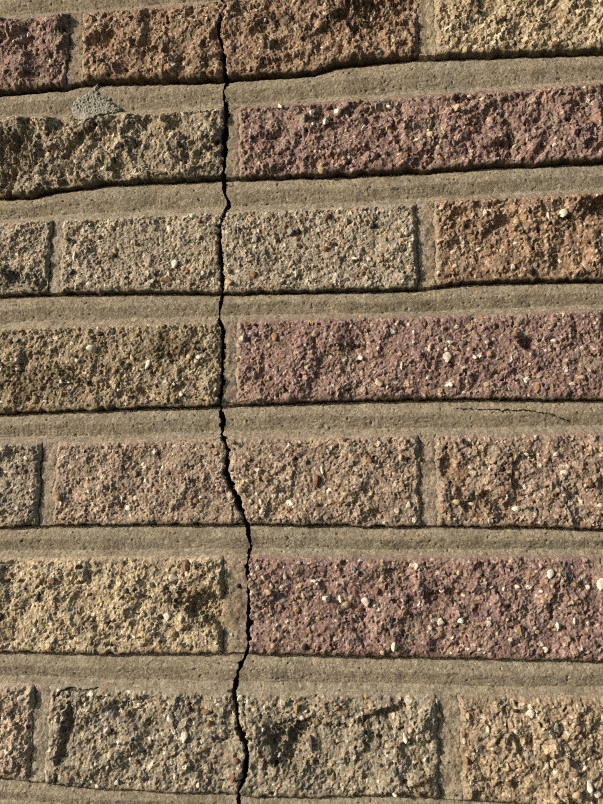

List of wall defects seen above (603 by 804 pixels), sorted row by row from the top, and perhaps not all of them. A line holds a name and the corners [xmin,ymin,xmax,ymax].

crack [217,0,254,804]